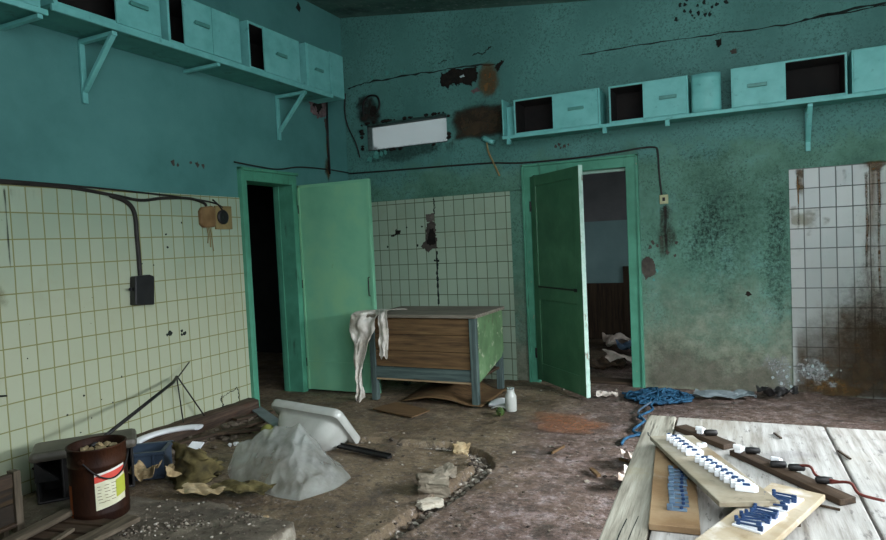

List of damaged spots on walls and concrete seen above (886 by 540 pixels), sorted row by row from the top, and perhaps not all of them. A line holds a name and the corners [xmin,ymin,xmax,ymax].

crack [578,2,886,56]
spalling [440,66,479,94]
spalling [359,105,413,162]
rust [796,170,804,225]
spalling [417,213,438,262]
damp [659,206,675,253]
rust [865,161,886,291]
damp [767,307,886,398]